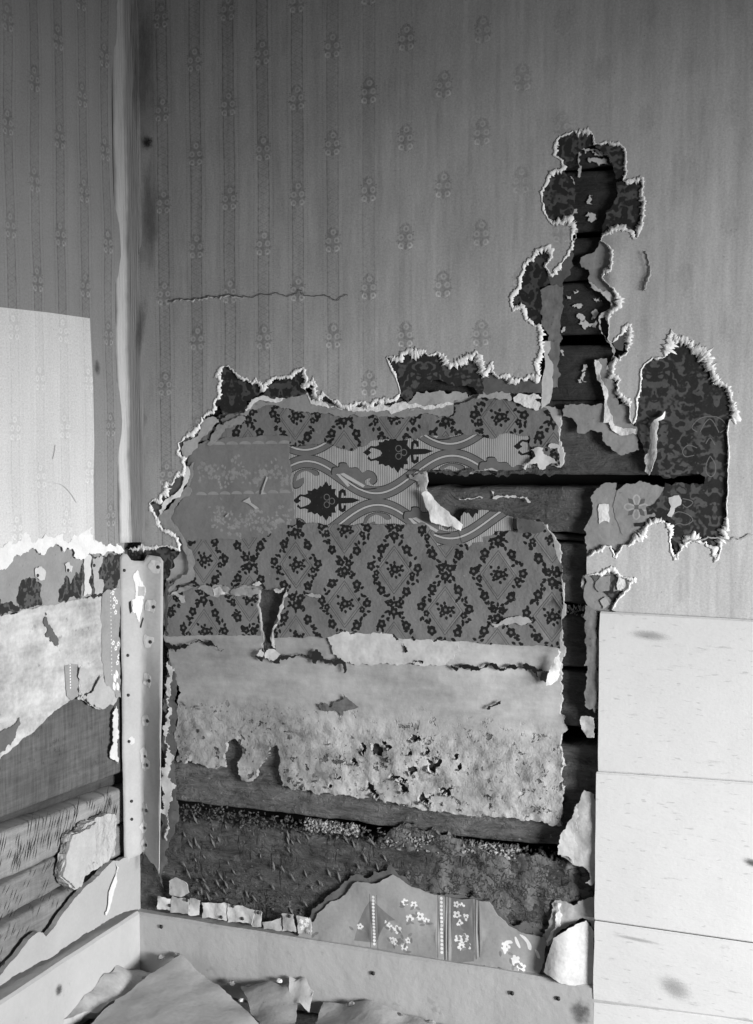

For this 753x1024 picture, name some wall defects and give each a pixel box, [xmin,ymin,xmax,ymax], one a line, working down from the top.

crack [169,290,347,303]
peeling [0,126,742,713]
peeling [78,666,119,762]
peeling [318,694,358,721]
peeling [158,650,180,886]
hole [352,734,462,809]